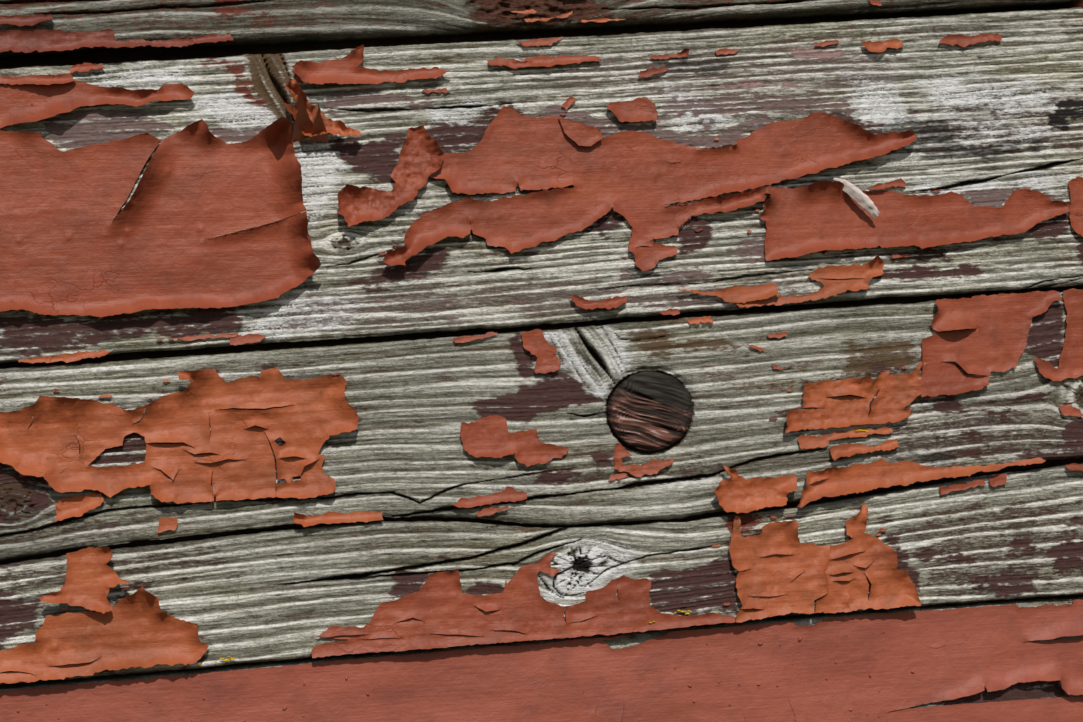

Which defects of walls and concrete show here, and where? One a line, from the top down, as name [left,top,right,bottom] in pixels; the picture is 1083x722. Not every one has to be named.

peeling [0,14,233,53]
peeling [487,37,601,69]
peeling [511,9,626,23]
peeling [638,48,690,78]
peeling [861,39,904,53]
peeling [939,33,1002,48]
peeling [0,44,451,317]
crack [911,159,1080,192]
peeling [337,96,1083,308]
crack [0,448,842,537]
peeling [0,288,1083,722]
crack [280,527,725,597]